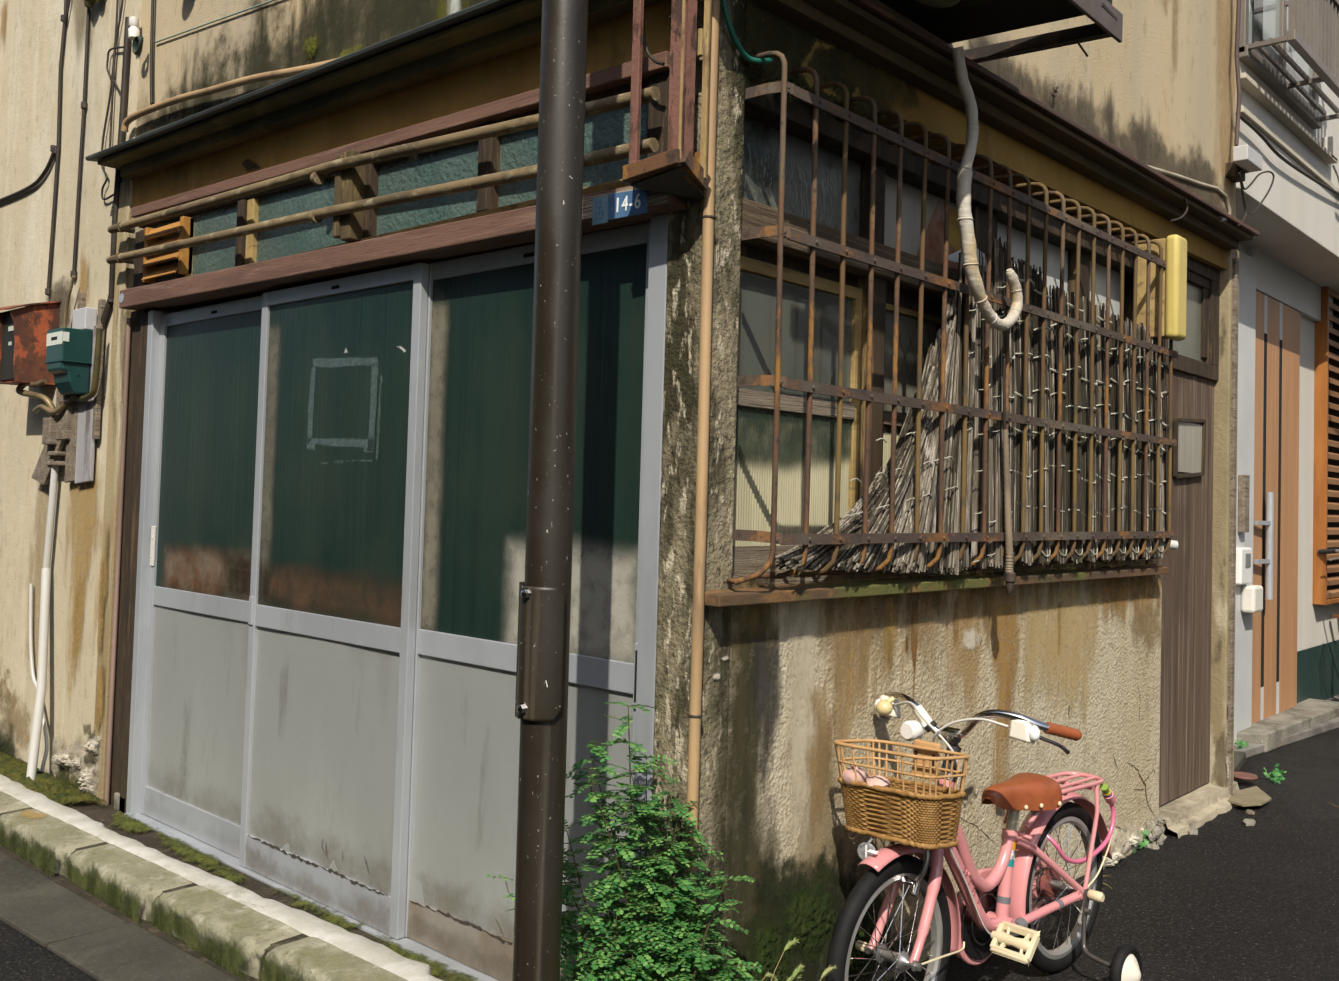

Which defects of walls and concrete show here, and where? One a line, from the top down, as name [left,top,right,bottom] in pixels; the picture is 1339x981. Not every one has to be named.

leakage [139,0,486,135]
leakage [969,0,1235,213]
leakage [0,681,29,746]
leakage [66,477,99,669]
leakage [716,604,779,977]
rust [889,591,973,672]
leakage [972,560,1160,784]